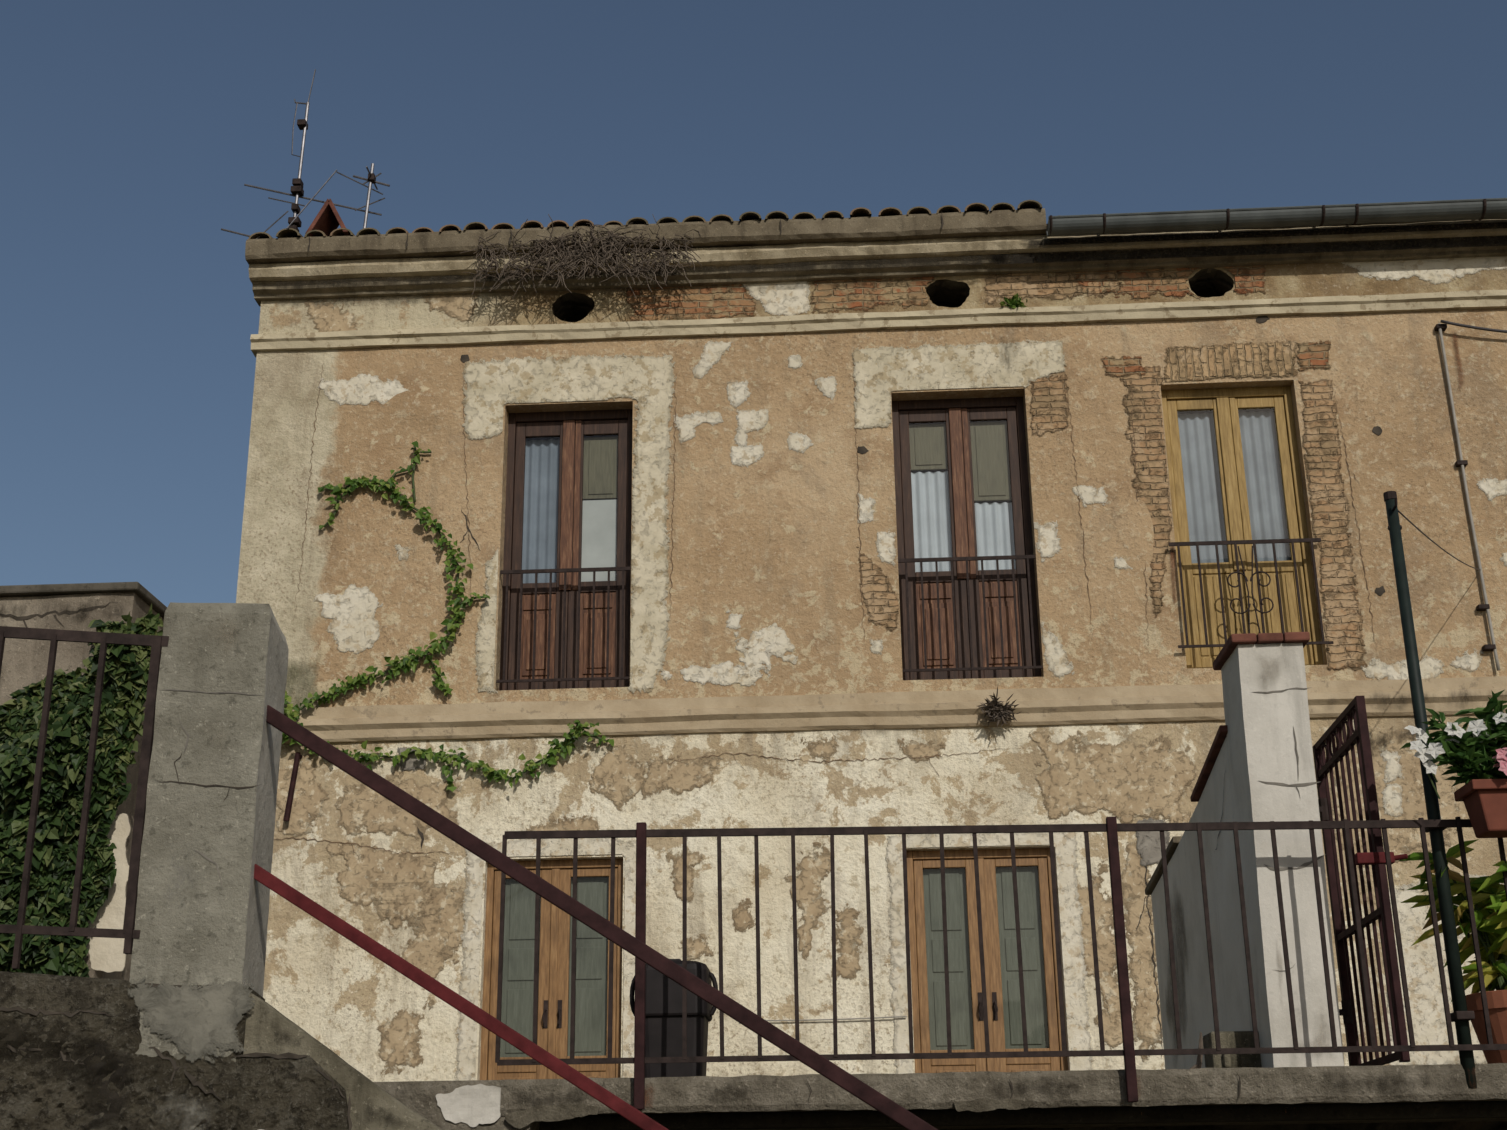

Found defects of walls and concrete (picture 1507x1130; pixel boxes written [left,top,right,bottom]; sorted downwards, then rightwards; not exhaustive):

flaking render [626,277,934,321]
peeling [1338,256,1507,285]
flaking render [1100,340,1484,680]
crack [0,602,118,628]
peeling [314,584,383,654]
peeling [660,610,799,687]
crack [1255,686,1312,694]
crack [155,689,258,800]
crack [1214,726,1319,853]
spalling [276,754,466,1080]
spalling [1028,730,1202,1062]
crack [1264,854,1326,871]